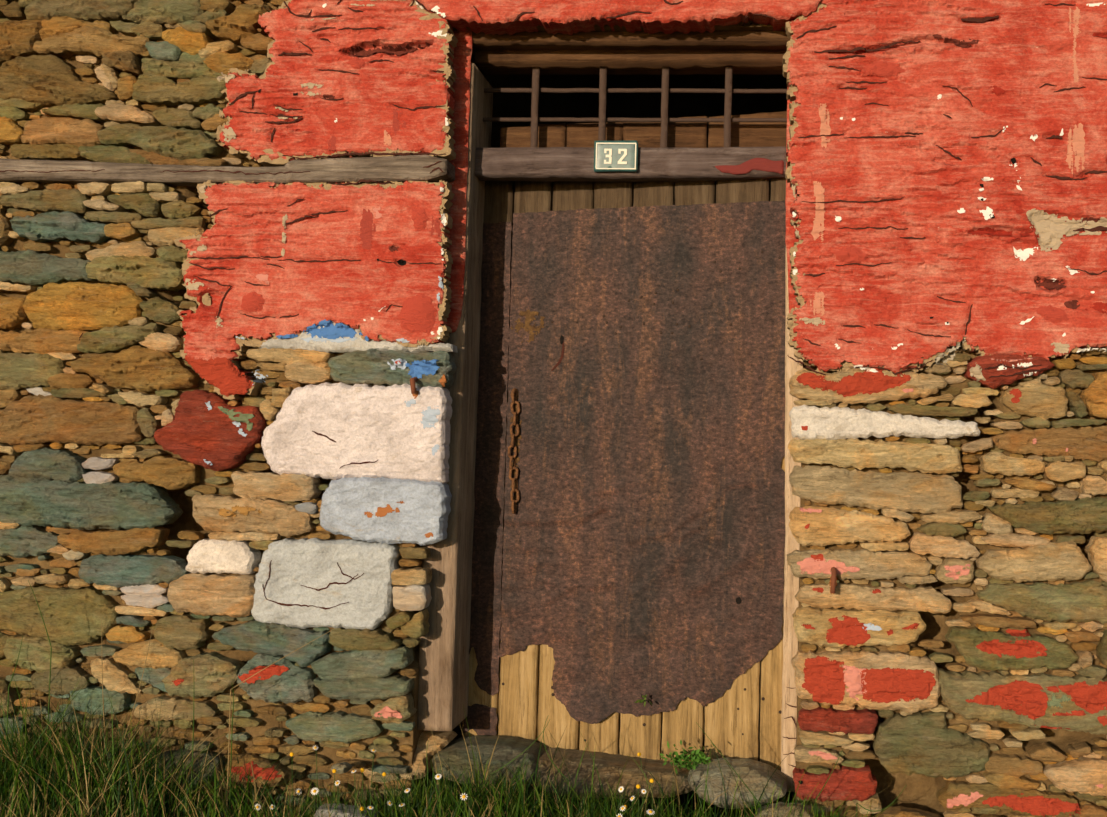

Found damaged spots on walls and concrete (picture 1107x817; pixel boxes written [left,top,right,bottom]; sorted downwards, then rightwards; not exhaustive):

spalling [959,163,1107,261]
spalling [1035,266,1080,291]
peeling [1064,291,1107,314]
spalling [926,338,966,369]
spalling [1051,333,1106,354]
spalling [969,363,986,382]
peeling [997,362,1036,377]
corrosion [509,391,522,500]
crack [262,560,364,610]